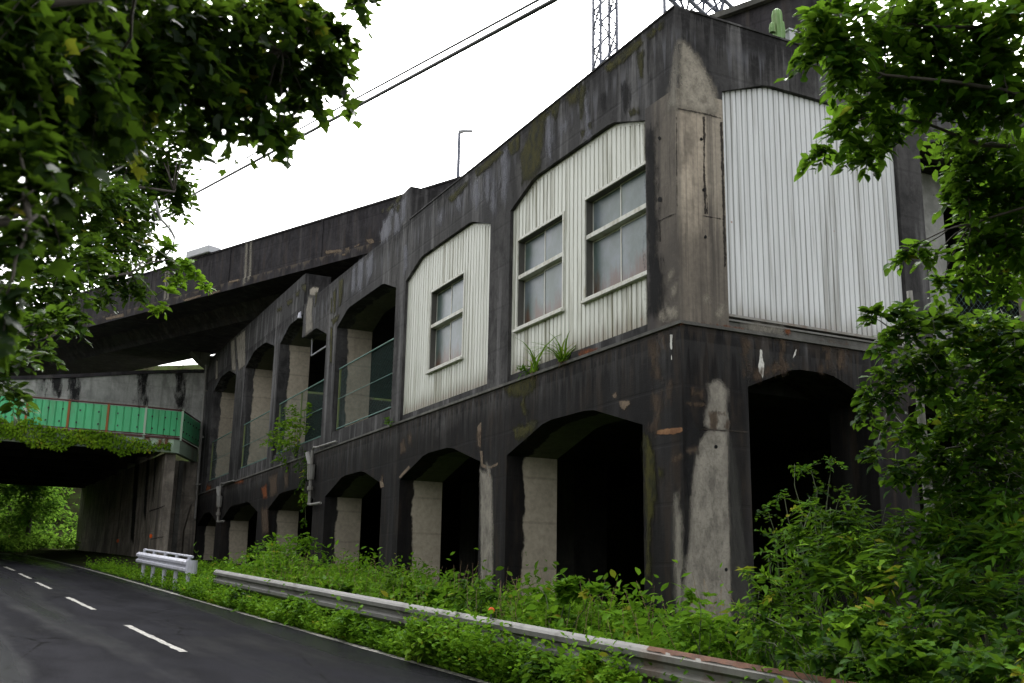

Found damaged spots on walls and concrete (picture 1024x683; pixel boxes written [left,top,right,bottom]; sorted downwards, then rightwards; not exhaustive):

water stain [645,127,664,315]
crack [659,108,727,267]
water stain [137,367,149,408]
water stain [174,367,187,412]
spalling [657,427,683,435]
water stain [672,411,730,497]
water stain [480,464,494,589]